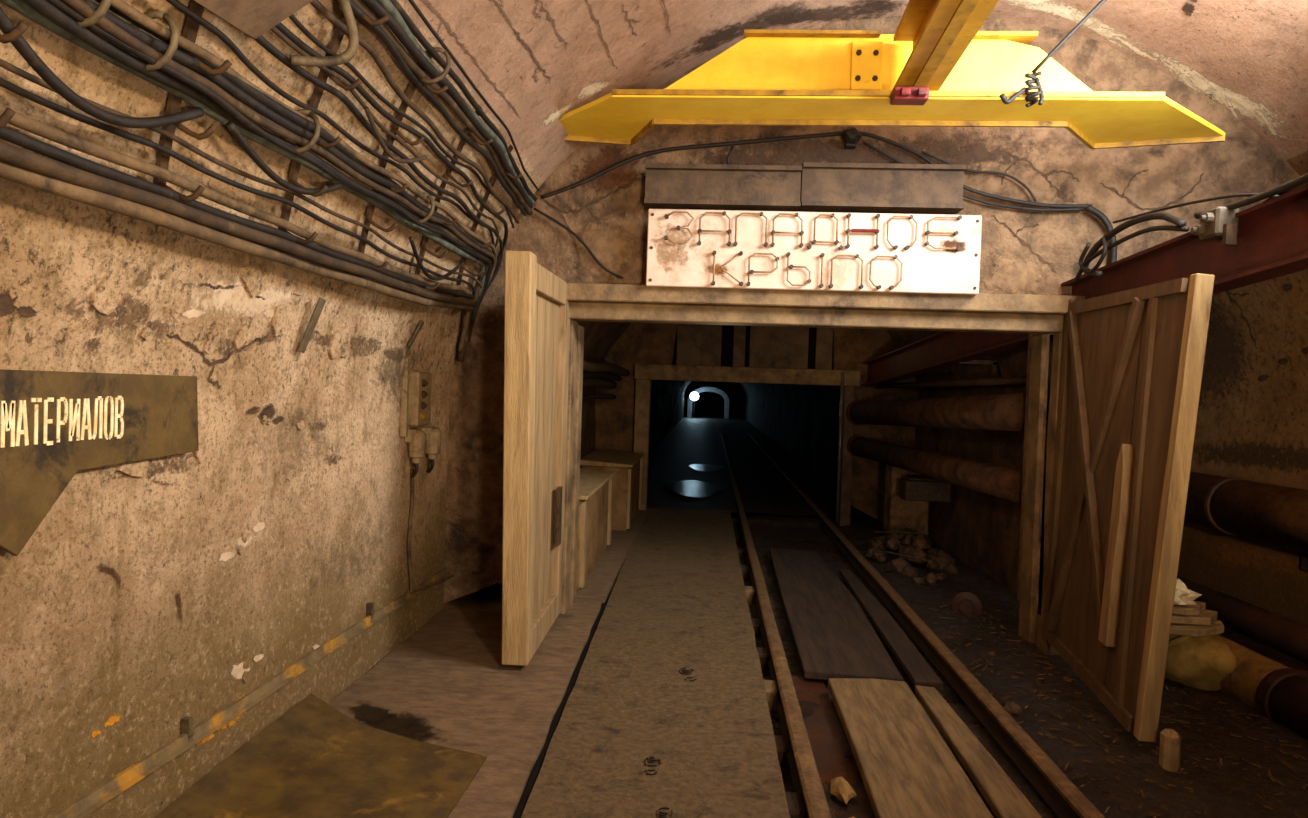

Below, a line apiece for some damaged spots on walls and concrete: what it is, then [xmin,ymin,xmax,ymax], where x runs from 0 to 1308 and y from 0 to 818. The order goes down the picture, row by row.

crack [421,0,521,119]
crack [493,0,568,83]
crack [585,0,671,70]
leakage [755,2,813,24]
leakage [852,0,901,15]